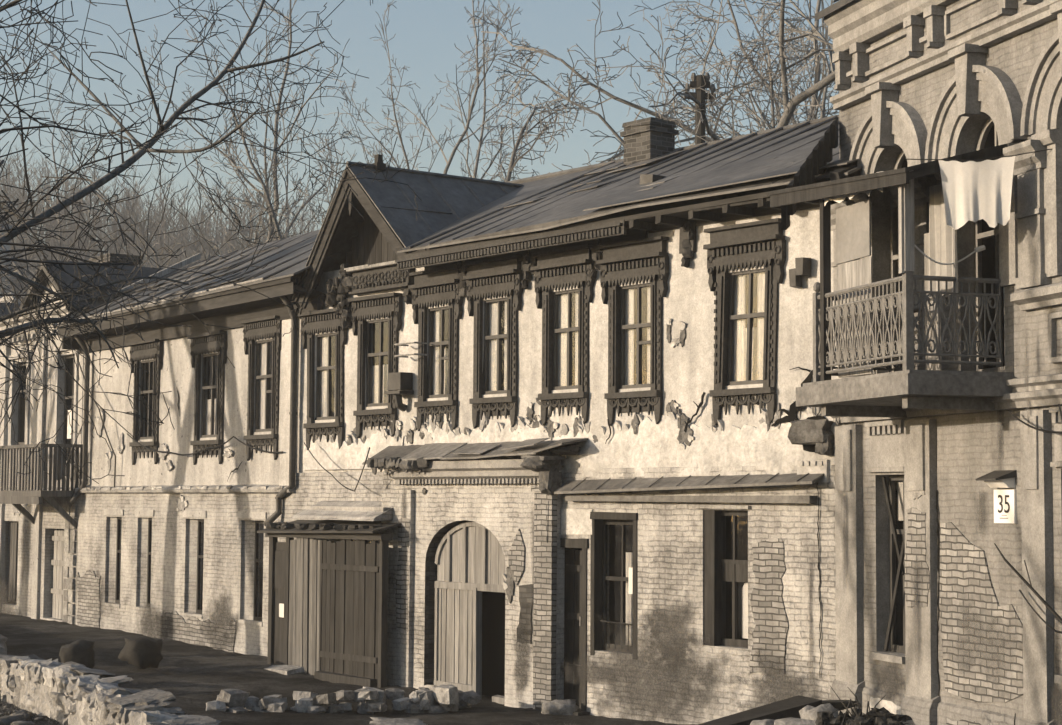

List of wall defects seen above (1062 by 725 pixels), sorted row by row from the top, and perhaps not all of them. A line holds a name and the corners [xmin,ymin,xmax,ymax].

spalling [666,318,686,348]
flaking render [303,393,844,477]
flaking render [502,529,534,644]
flaking render [750,538,789,673]
flaking render [904,490,1023,702]